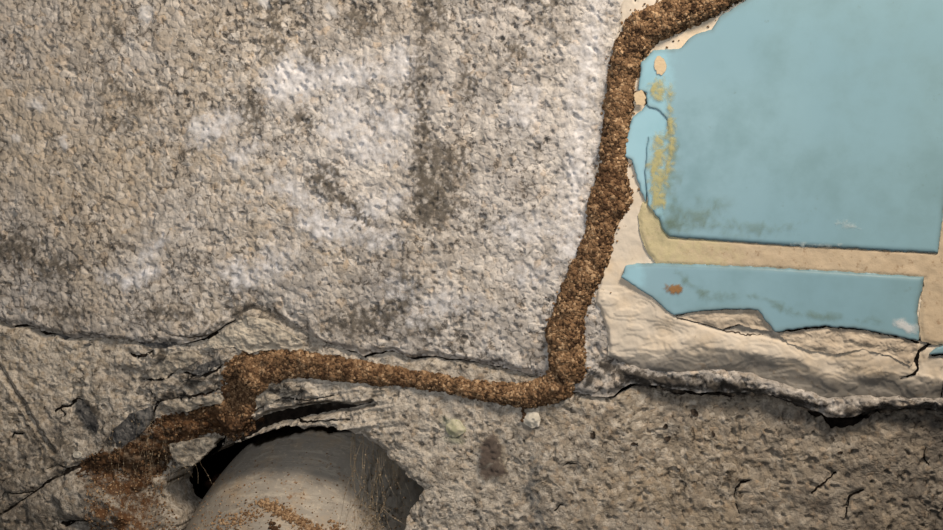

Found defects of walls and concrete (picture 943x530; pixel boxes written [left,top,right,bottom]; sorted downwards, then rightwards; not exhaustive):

water stain [192,0,473,234]
water stain [472,0,600,259]
water stain [269,163,401,248]
crack [5,322,56,335]
crack [130,320,236,433]
water stain [223,252,284,287]
water stain [318,267,467,337]
crack [325,342,537,376]
crack [610,384,943,428]
peeling [676,309,918,366]
crack [675,309,943,379]
crack [0,458,94,516]